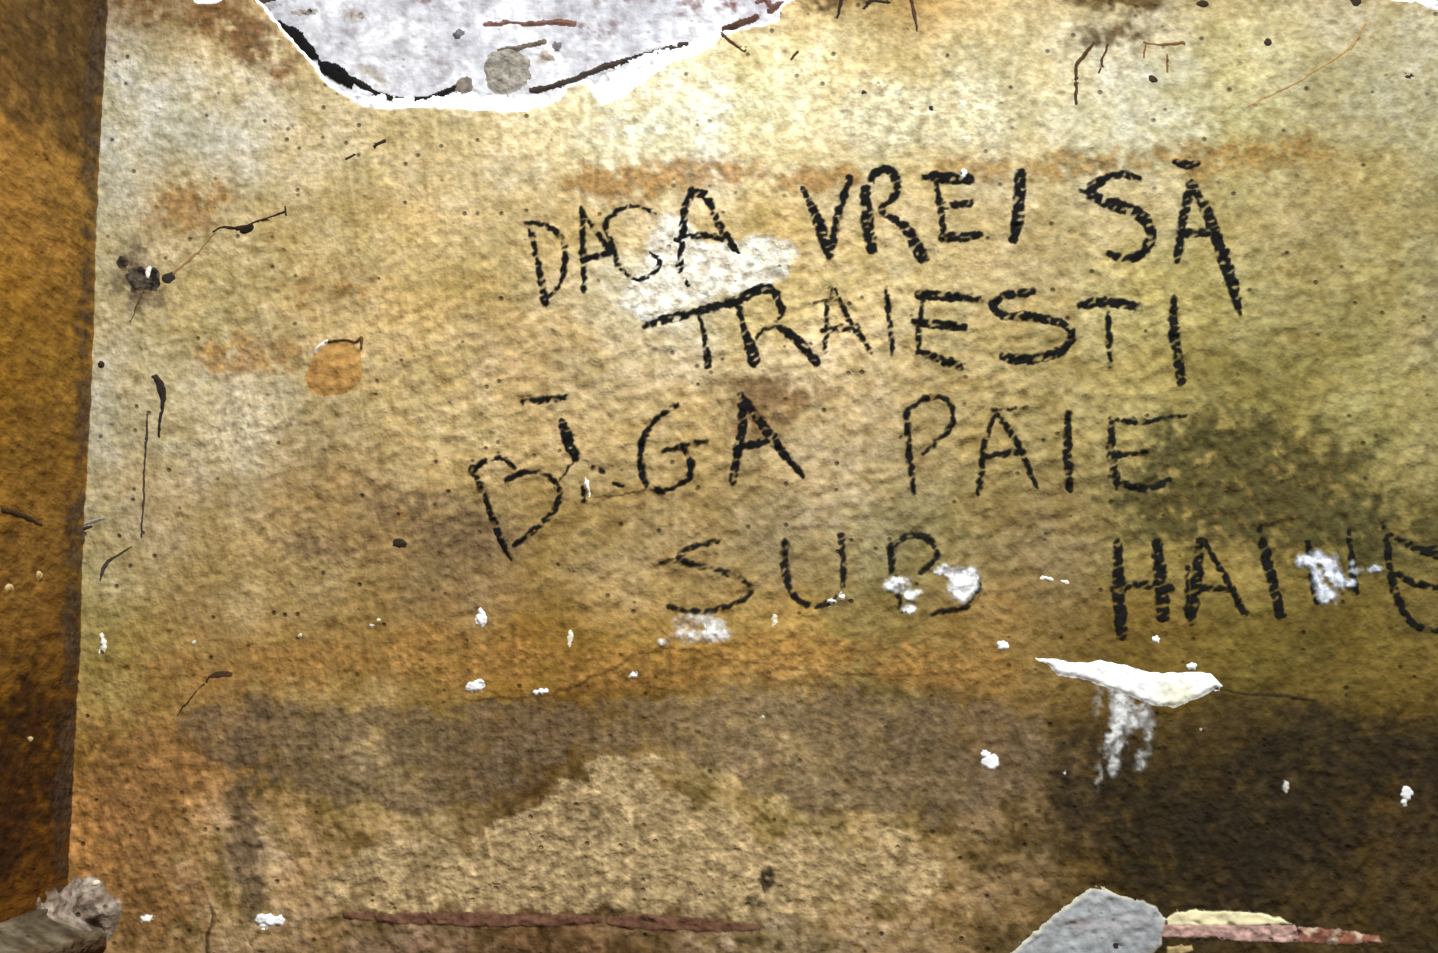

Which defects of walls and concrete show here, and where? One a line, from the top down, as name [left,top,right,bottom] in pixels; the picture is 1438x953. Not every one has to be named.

peeling [255,0,797,112]
peeling [1393,0,1438,10]
leakage [0,675,65,878]
leakage [226,701,264,921]
peeling [1036,658,1314,782]
spalling [1012,885,1166,953]